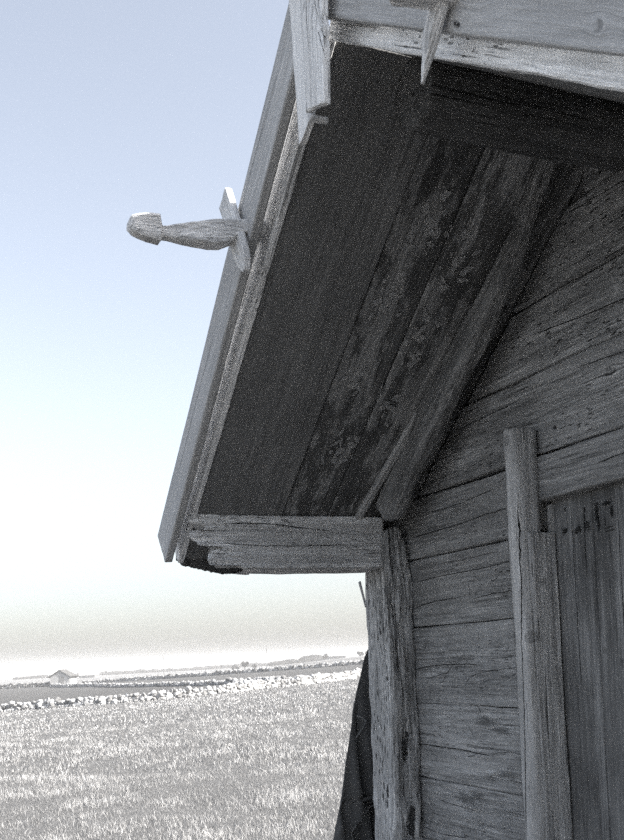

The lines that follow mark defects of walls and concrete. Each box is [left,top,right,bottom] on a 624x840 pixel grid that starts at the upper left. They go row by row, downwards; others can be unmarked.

crack [228,519,340,547]